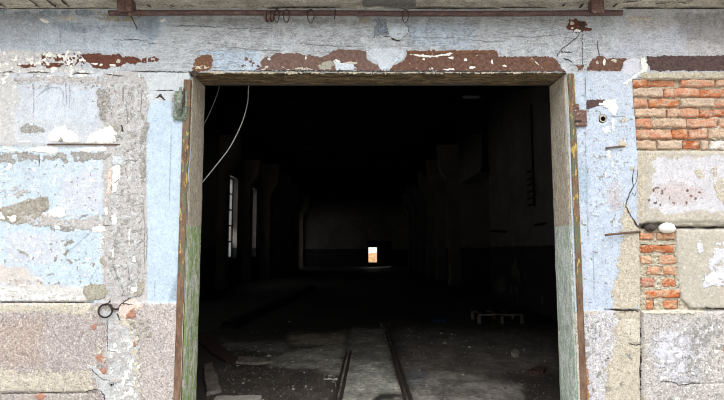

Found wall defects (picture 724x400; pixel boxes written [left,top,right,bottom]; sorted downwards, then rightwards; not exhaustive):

crack [267,4,340,12]
peeling [188,48,567,77]
crack [218,7,600,94]
flaking render [0,50,165,332]
crack [625,166,639,227]
flaking render [576,55,724,400]